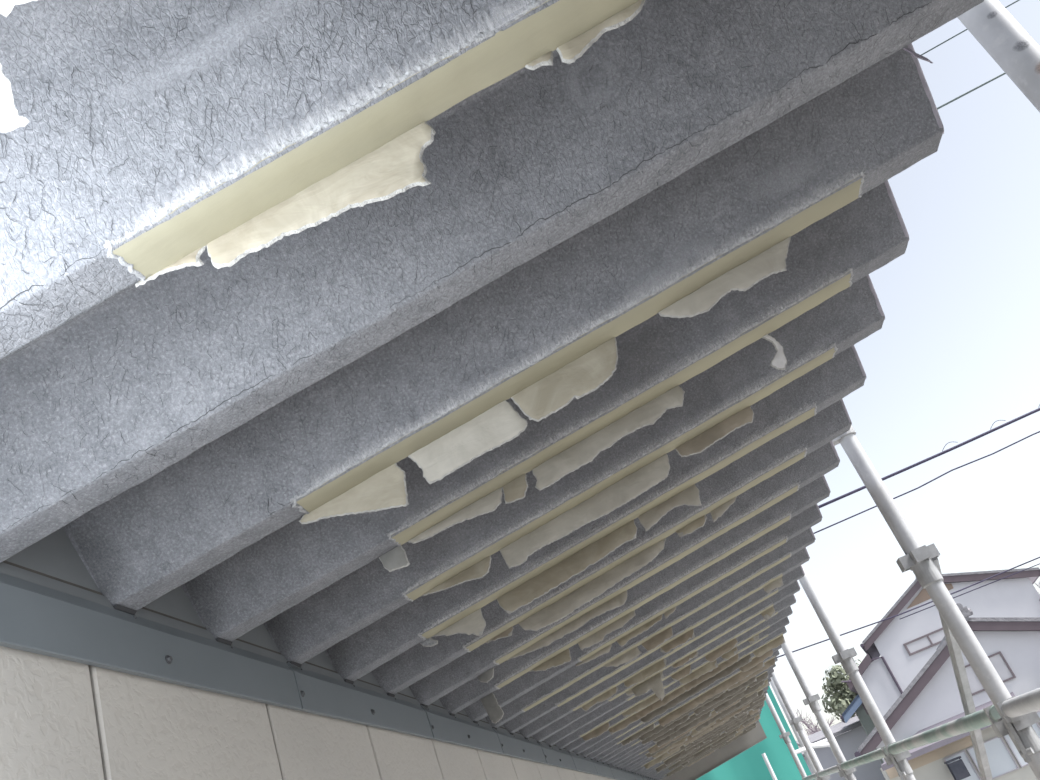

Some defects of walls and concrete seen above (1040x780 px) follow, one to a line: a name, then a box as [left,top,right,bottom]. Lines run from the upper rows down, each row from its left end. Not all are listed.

peeling [0,63,29,133]
peeling [0,0,37,17]
peeling [103,0,645,287]
crack [0,0,941,531]
peeling [290,171,866,524]
peeling [379,268,854,777]